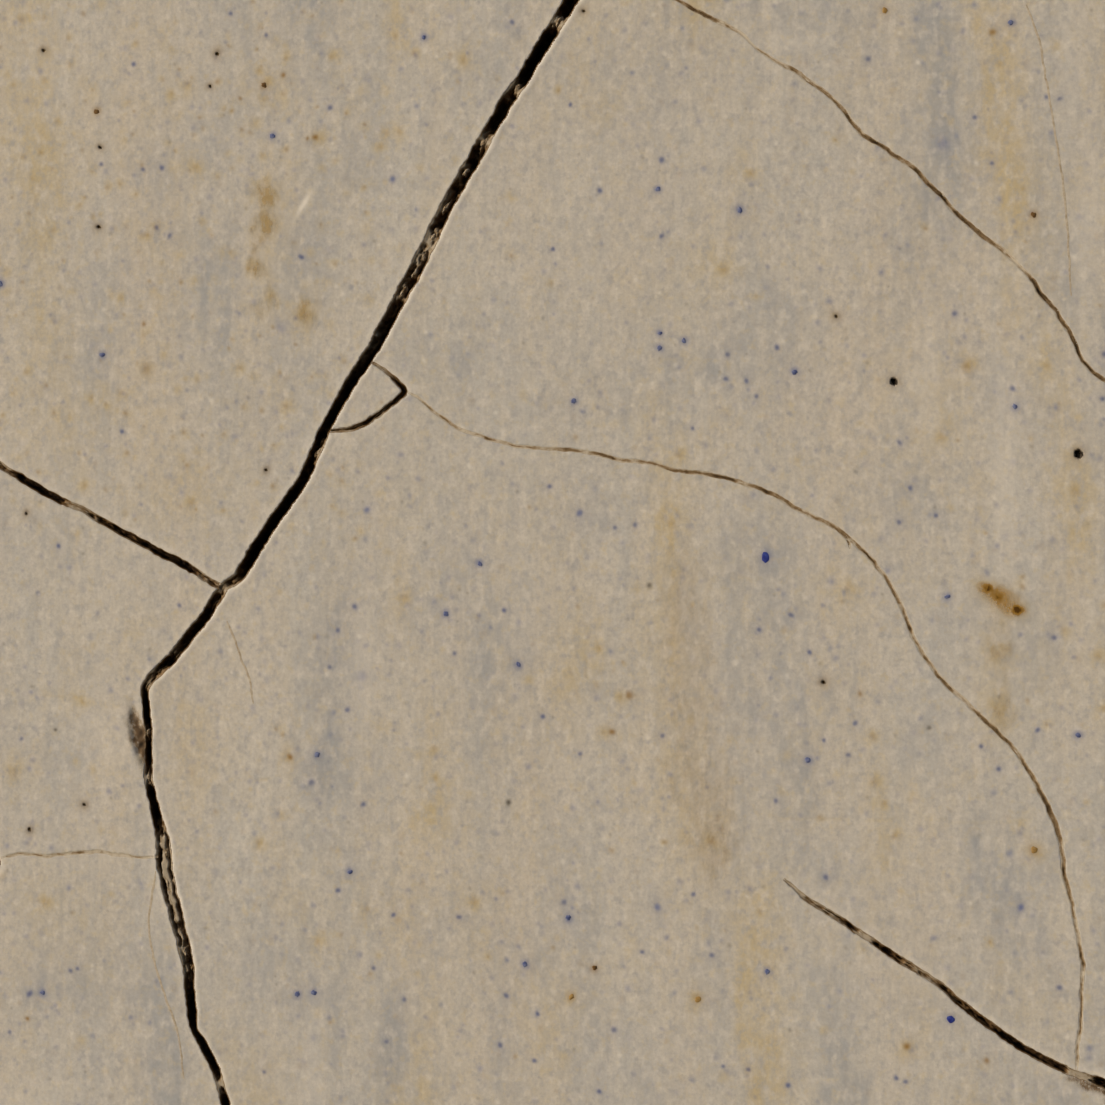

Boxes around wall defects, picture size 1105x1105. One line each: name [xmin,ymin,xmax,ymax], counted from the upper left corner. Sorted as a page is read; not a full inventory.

crack [674,0,1105,383]
crack [0,0,579,1105]
crack [406,392,1105,1095]
rust [981,583,1025,616]